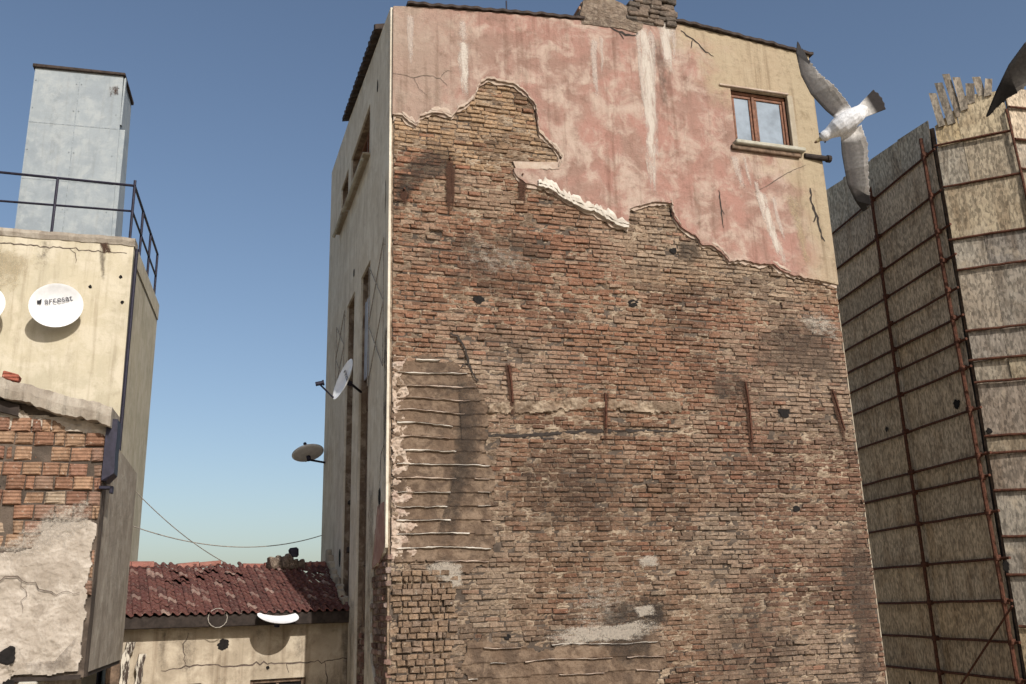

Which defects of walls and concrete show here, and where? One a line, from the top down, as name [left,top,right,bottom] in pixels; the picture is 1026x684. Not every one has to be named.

water stain [637,24,675,180]
spalling [394,77,629,229]
crack [759,165,825,241]
rust [505,363,515,416]
rust [743,381,754,450]
spalling [372,355,418,568]
crack [0,576,80,606]
crack [164,636,347,684]